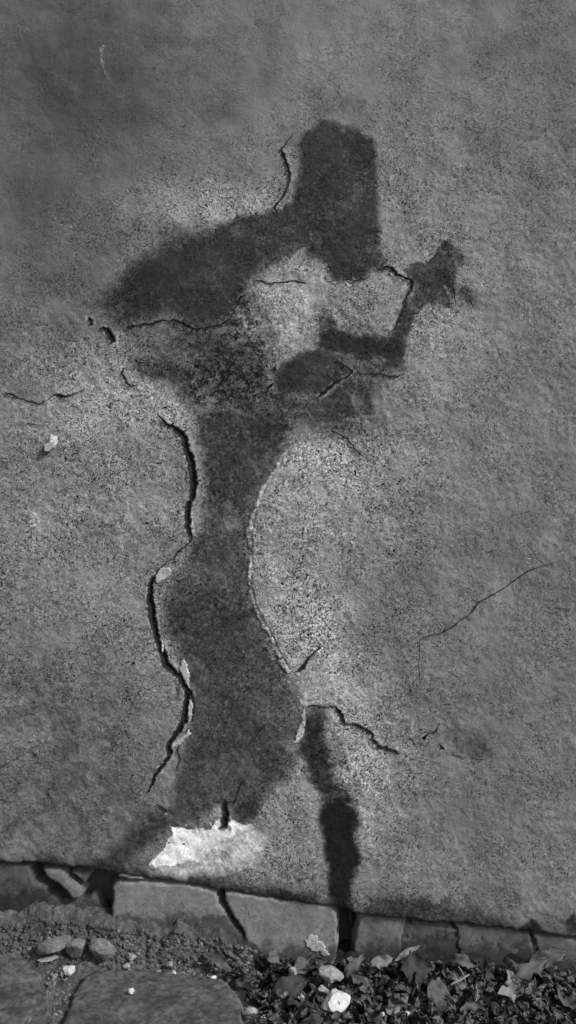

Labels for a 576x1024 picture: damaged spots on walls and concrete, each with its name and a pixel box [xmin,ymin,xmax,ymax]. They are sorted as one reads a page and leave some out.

crack [273,134,293,212]
leakage [107,120,383,326]
leakage [90,240,472,872]
crack [147,413,198,813]
crack [306,705,399,755]
spalling [149,819,261,876]
leakage [268,891,308,904]